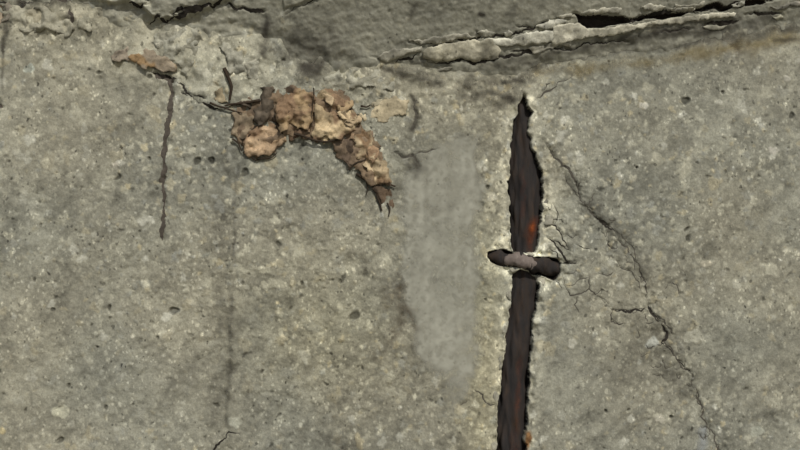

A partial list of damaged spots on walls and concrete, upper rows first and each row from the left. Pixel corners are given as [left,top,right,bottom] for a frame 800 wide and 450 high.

crack [129,0,265,25]
crack [151,72,221,240]
spalling [532,151,553,239]
spalling [522,272,559,450]
crack [545,147,719,450]